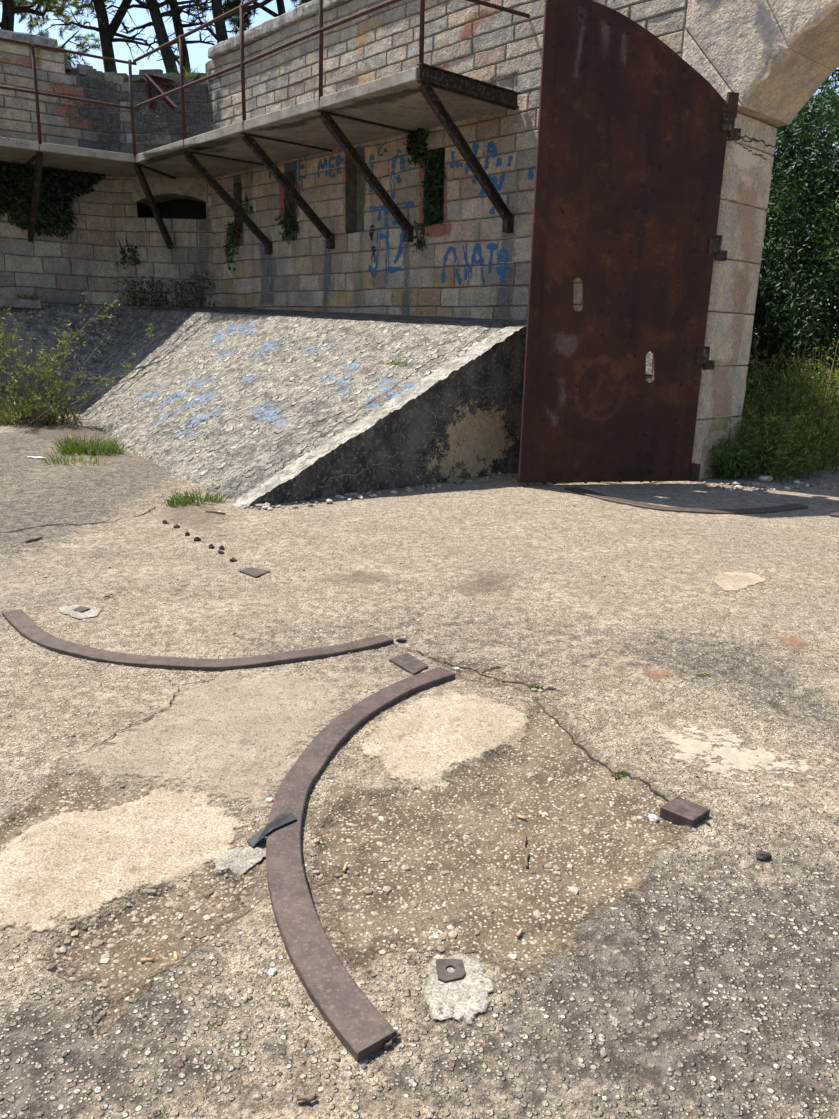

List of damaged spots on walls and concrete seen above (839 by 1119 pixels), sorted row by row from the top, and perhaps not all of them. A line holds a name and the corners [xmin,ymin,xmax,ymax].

rust [459,9,499,48]
peeling [412,390,521,483]
crack [8,506,156,532]
crack [86,679,212,751]
crack [402,647,669,802]